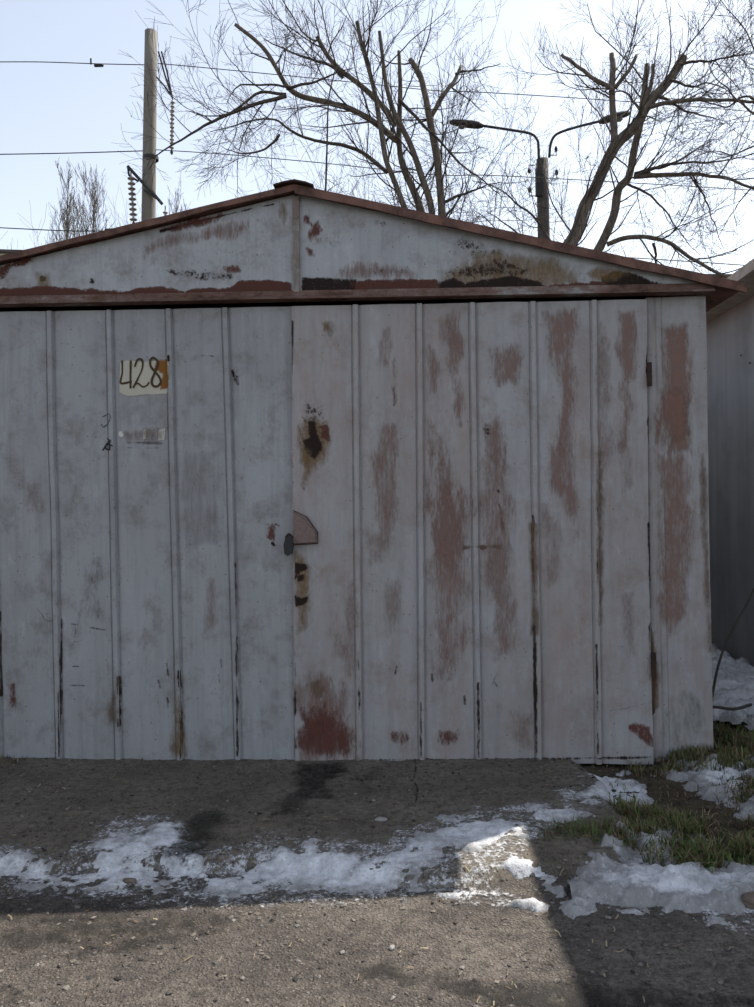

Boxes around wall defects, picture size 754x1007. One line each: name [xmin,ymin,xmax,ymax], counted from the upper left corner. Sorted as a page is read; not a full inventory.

rust [0,239,662,296]
rust [300,403,330,474]
rust [463,604,651,760]